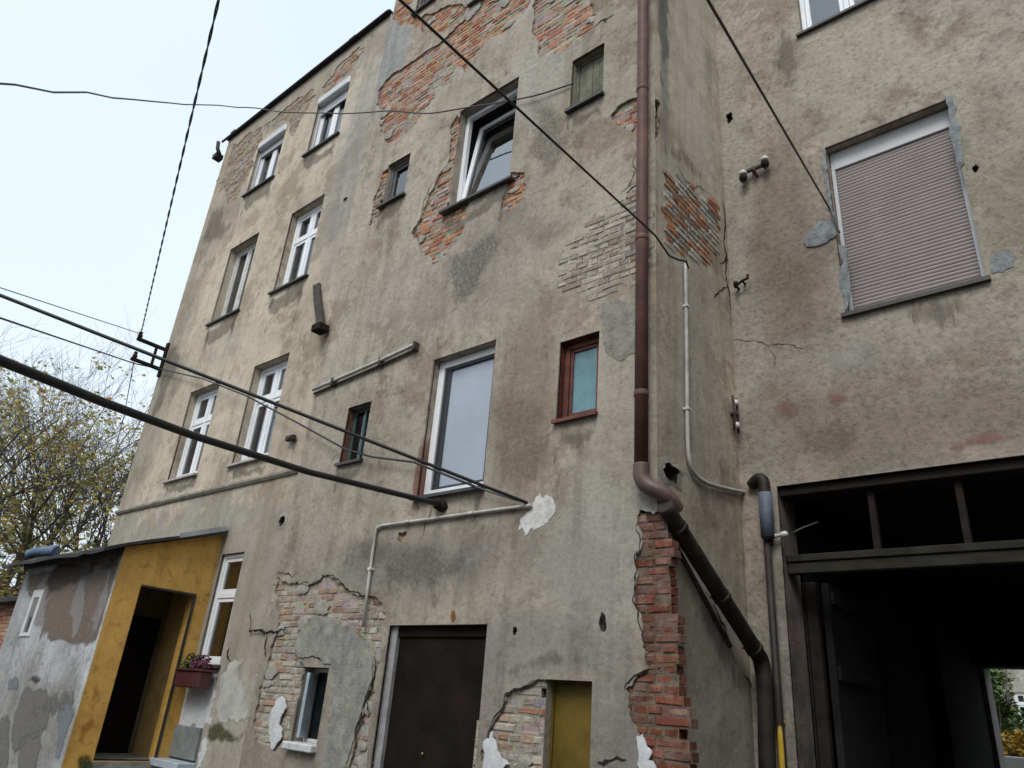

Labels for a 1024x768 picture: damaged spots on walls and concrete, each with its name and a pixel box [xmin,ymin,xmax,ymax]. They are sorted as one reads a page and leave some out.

flaking render [378,0,596,144]
flaking render [612,98,637,132]
flaking render [371,171,388,225]
flaking render [412,117,468,264]
flaking render [502,173,526,211]
flaking render [557,155,721,302]
spalling [657,456,686,491]
damp [31,574,49,630]
damp [69,563,113,638]
flaking render [179,569,386,768]
flaking render [624,511,699,768]
flaking render [473,678,547,768]